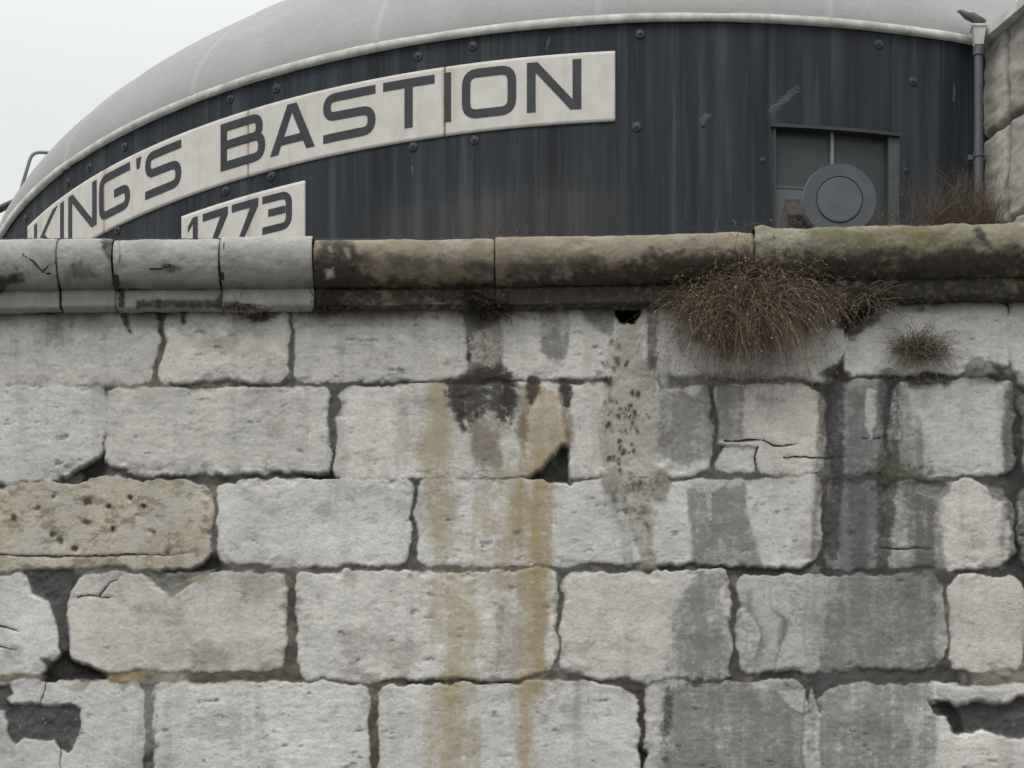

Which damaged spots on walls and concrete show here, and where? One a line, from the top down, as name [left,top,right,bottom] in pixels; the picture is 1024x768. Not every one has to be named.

crack [22,253,57,277]
damp [313,228,1024,574]
spalling [532,447,570,485]
crack [724,439,842,467]
crack [0,553,183,598]
spalling [0,685,81,752]
spalling [931,685,1024,739]